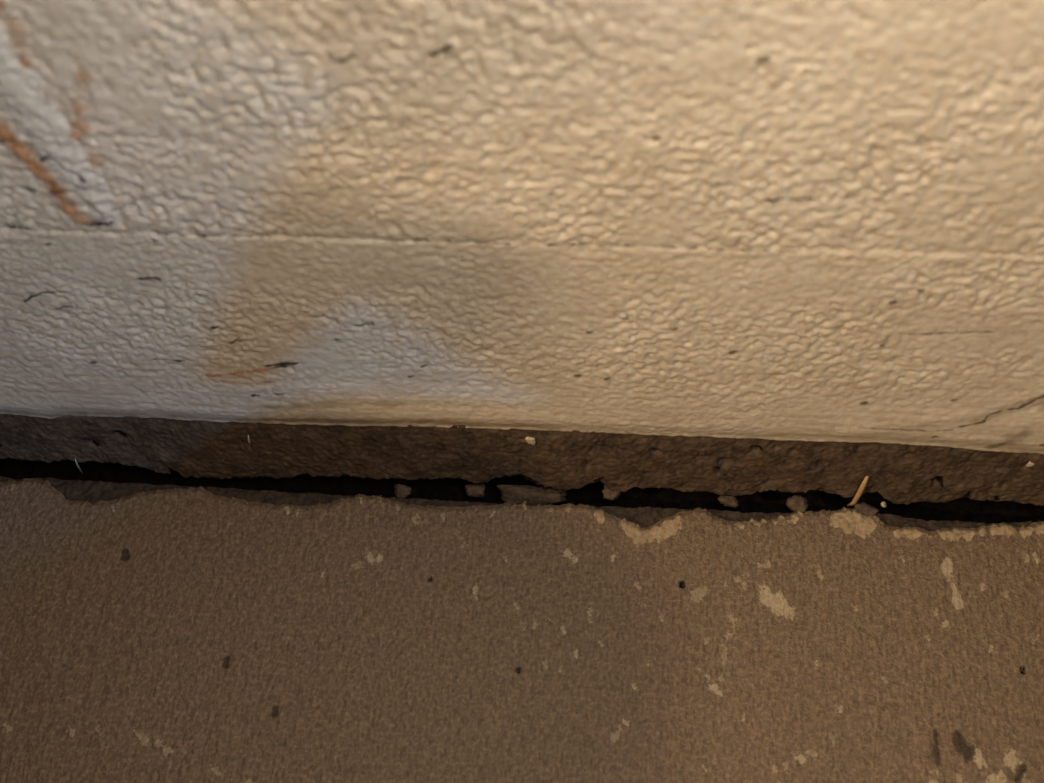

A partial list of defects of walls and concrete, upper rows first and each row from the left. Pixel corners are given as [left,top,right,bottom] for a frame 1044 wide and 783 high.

crack [0,457,1044,524]
spalling [593,506,692,548]
spalling [706,509,804,529]
spalling [830,508,1044,542]